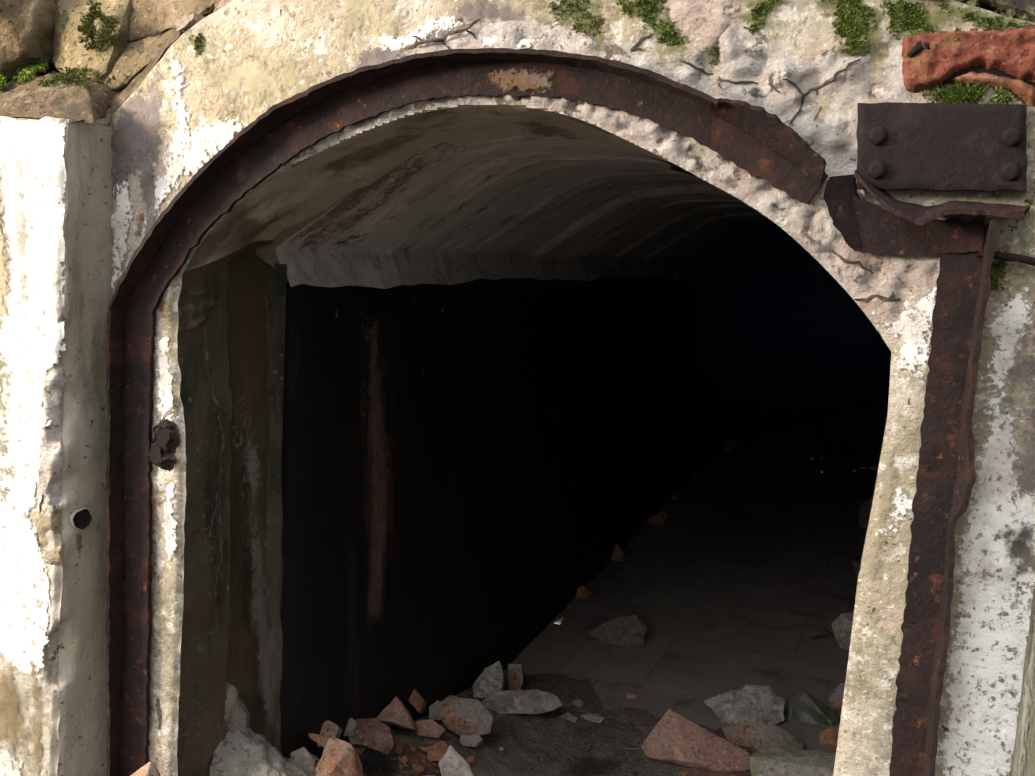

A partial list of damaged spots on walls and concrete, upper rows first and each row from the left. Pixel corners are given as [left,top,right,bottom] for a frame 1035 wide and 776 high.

crack [680,59,860,125]
damp [0,152,35,326]
damp [936,279,1035,776]
damp [0,661,51,776]